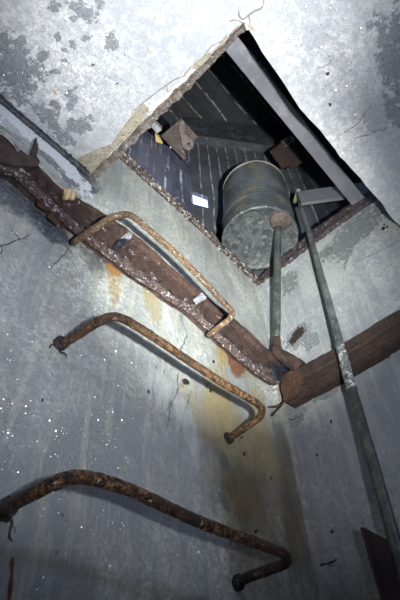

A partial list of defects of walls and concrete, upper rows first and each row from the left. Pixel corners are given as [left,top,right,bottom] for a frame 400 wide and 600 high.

crack [0,229,29,254]
corrosion [219,347,245,377]